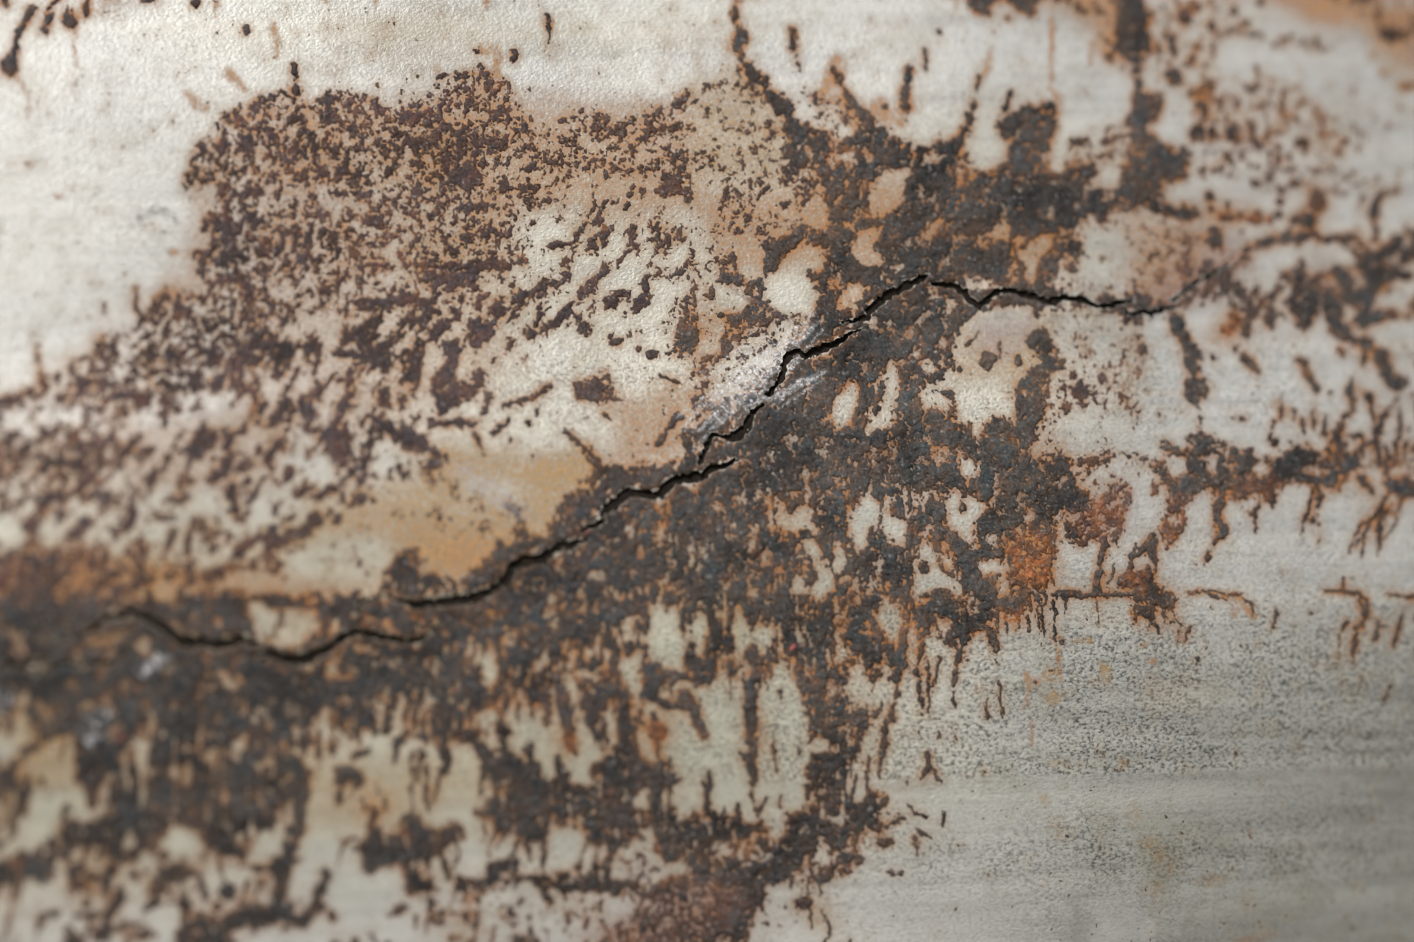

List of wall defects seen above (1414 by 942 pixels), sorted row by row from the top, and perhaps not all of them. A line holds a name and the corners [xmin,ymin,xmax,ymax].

corrosion [0,0,112,116]
corrosion [189,0,251,36]
corrosion [1256,0,1414,77]
corrosion [1366,79,1414,139]
crack [0,263,1230,677]
corrosion [1239,573,1414,703]
corrosion [905,750,943,786]